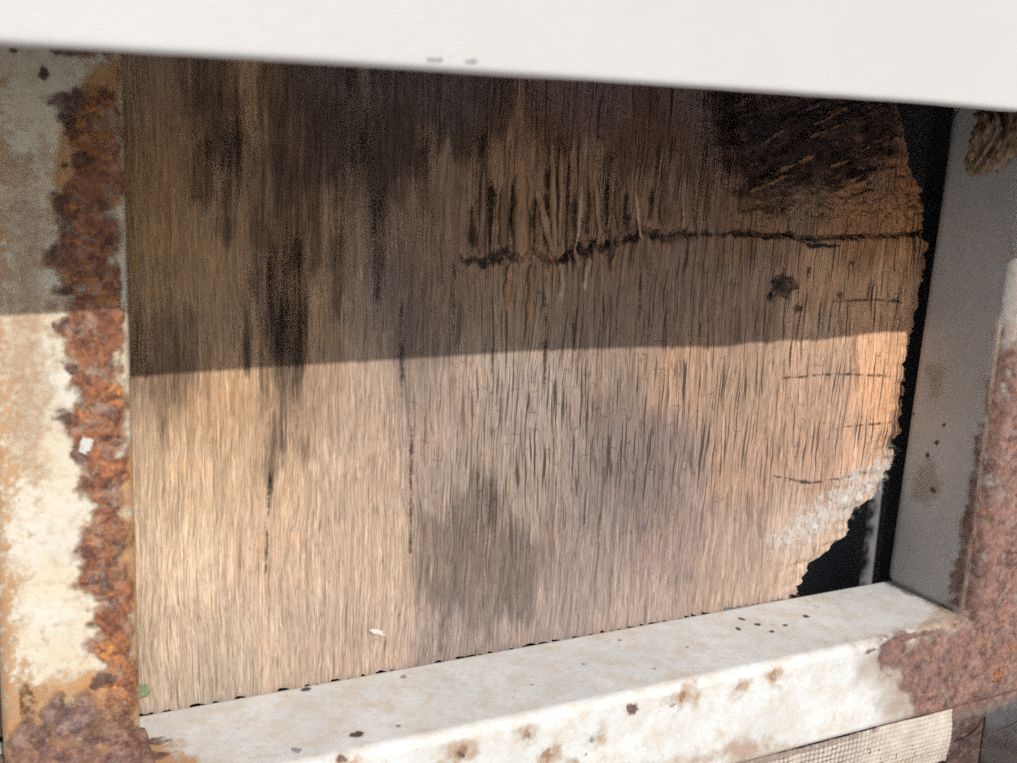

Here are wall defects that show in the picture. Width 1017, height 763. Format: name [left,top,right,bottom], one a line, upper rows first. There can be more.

corrosion [0,49,198,763]
crack [454,246,523,281]
crack [554,230,921,263]
corrosion [864,344,1017,723]